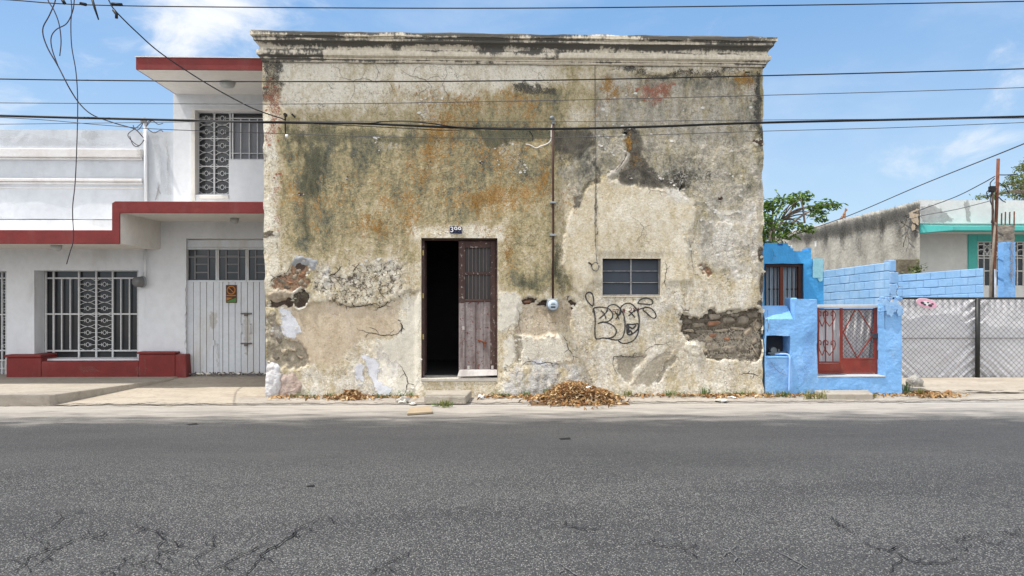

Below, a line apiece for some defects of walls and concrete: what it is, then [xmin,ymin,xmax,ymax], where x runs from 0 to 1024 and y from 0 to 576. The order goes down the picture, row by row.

water stain [262,62,284,102]
water stain [513,81,557,95]
water stain [616,65,739,81]
water stain [744,72,763,140]
water stain [293,127,438,203]
water stain [474,126,600,208]
water stain [619,129,696,188]
peeling [265,257,422,396]
crack [331,264,405,336]
flaking render [678,247,766,363]